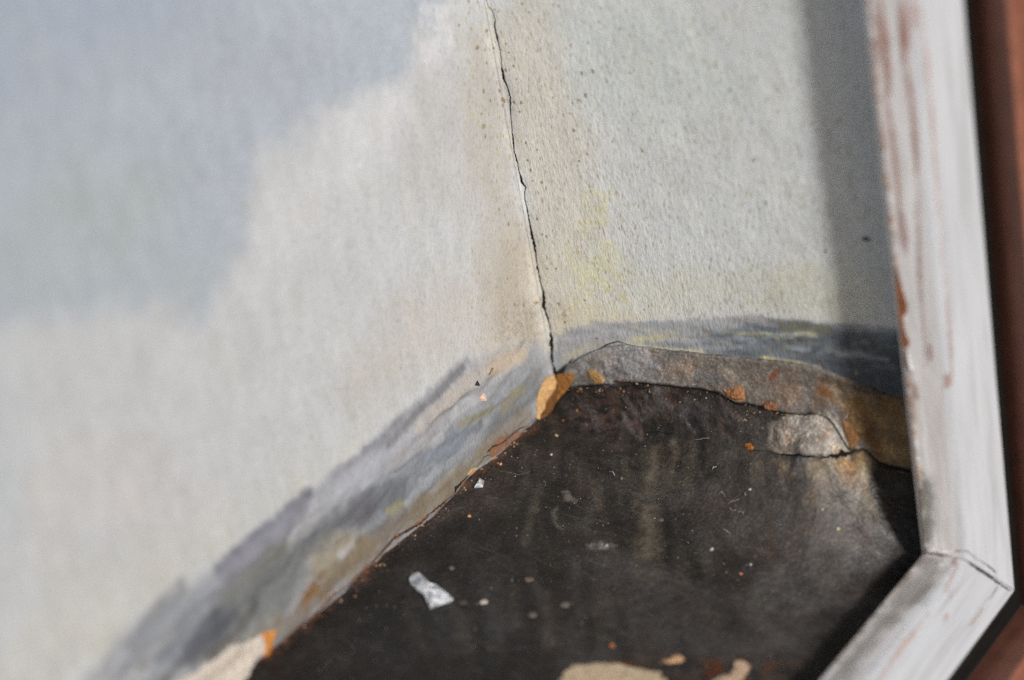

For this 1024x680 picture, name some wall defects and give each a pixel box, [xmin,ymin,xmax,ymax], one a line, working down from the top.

crack [486,0,633,374]
spalling [536,370,605,420]
crack [754,448,913,473]